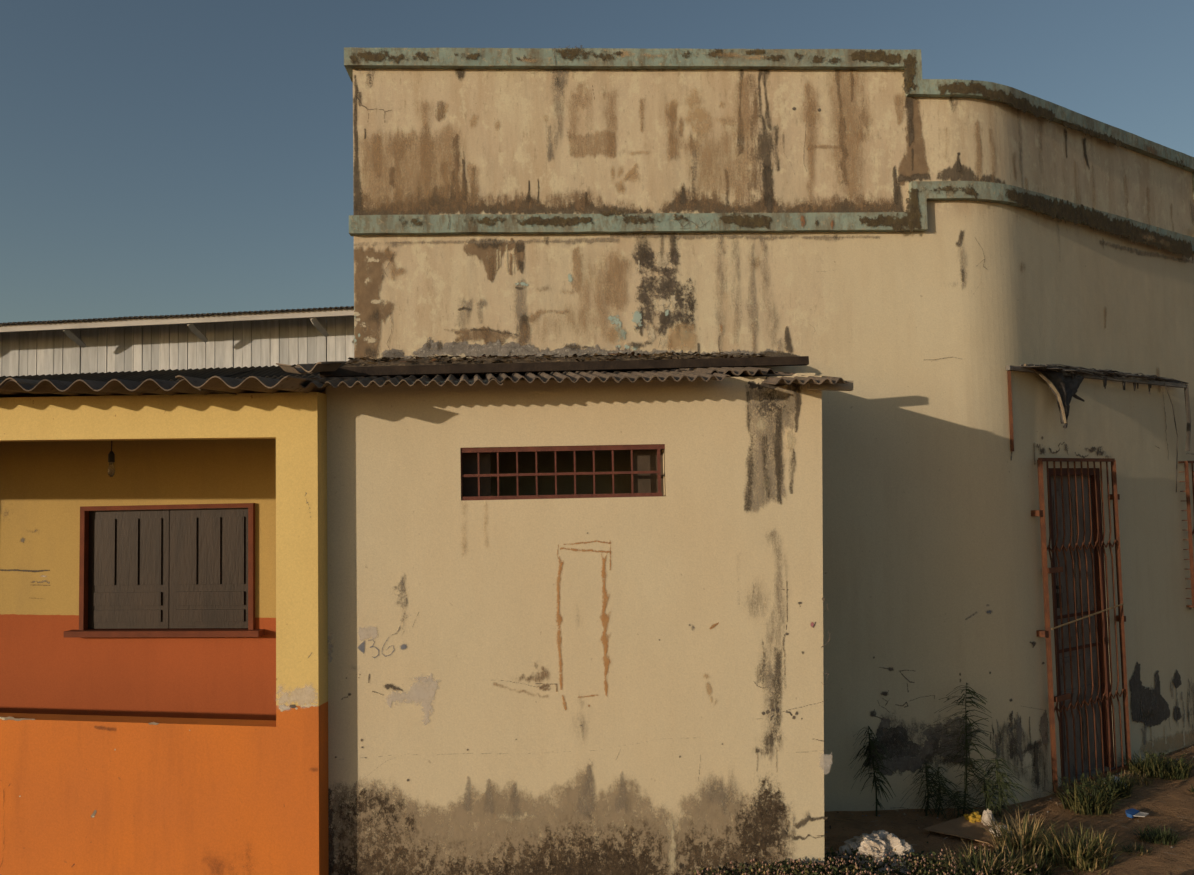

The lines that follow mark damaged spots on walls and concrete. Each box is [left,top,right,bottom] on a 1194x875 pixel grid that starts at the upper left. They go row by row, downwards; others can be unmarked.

water stain [350,45,1194,357]
peeling [354,247,403,359]
water stain [744,381,801,511]
peeling [279,687,317,712]
water stain [754,634,785,753]
water stain [990,706,1049,798]
water stain [328,765,827,875]